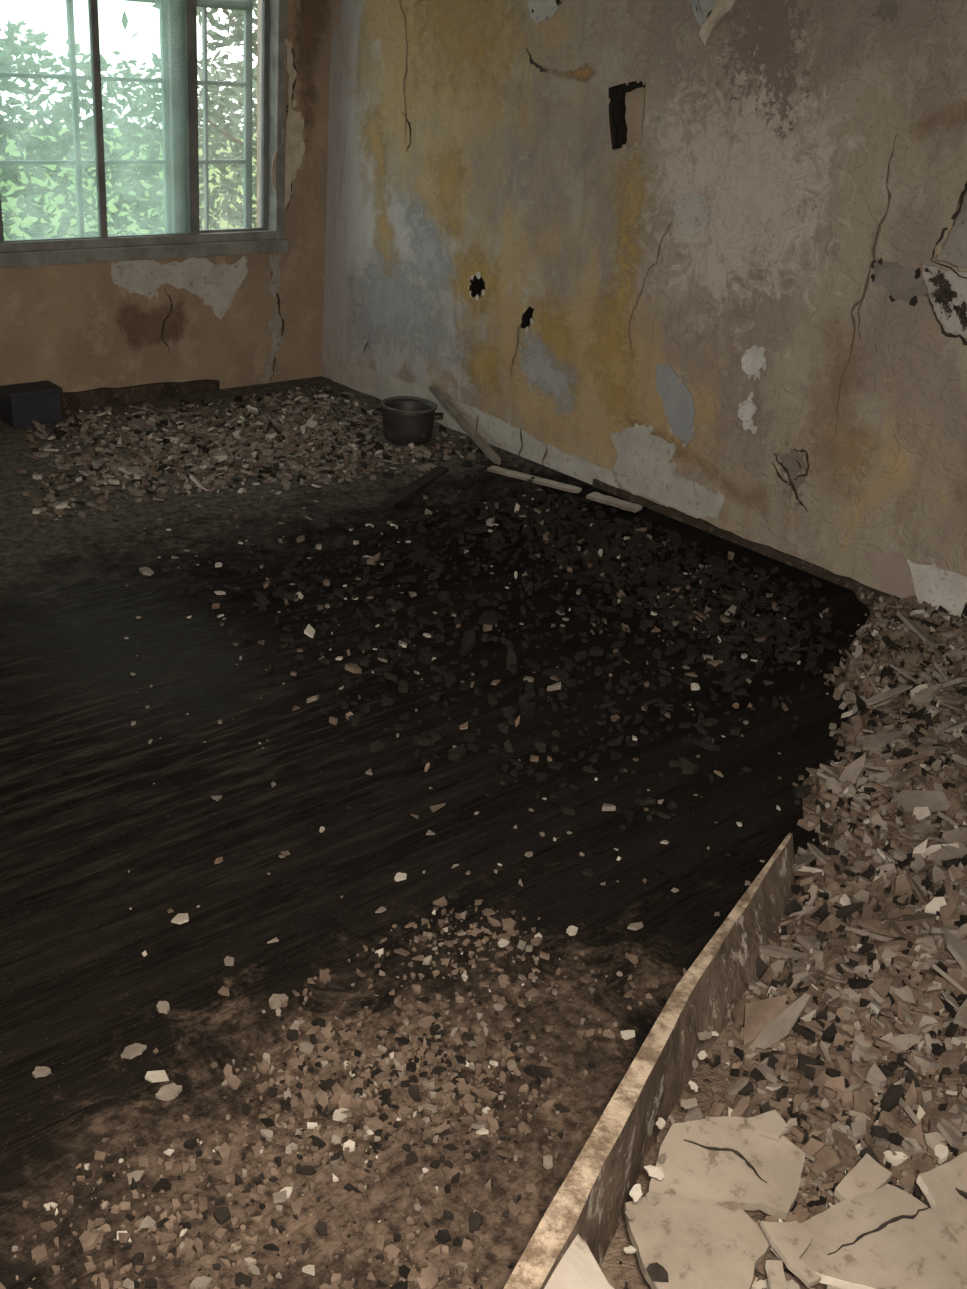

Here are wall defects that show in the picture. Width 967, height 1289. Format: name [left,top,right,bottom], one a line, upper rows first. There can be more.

peeling [528,0,562,23]
peeling [688,0,819,141]
water stain [118,305,184,346]
peeling [111,255,248,319]
crack [772,134,897,512]
peeling [871,191,967,340]
spalling [737,345,767,434]
peeling [324,360,725,519]
peeling [865,551,967,617]